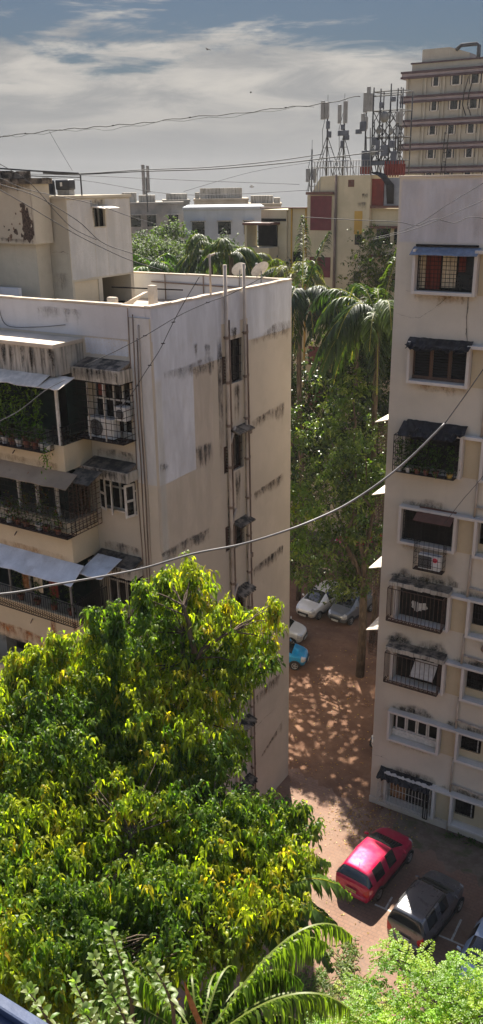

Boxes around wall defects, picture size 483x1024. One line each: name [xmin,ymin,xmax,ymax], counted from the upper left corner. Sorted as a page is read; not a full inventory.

flaking render [4,203,34,243]